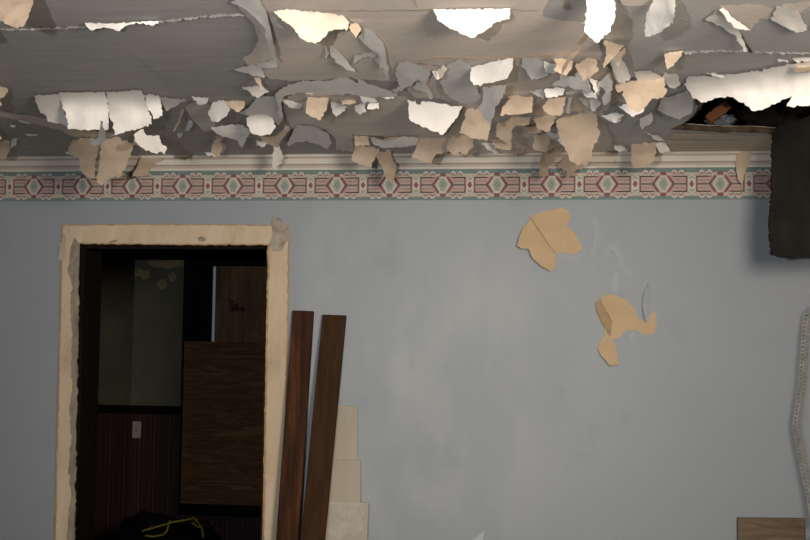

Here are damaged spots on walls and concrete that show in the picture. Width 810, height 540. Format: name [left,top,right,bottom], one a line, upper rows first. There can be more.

peeling [0,0,810,185]
peeling [517,208,583,271]
peeling [596,285,657,366]